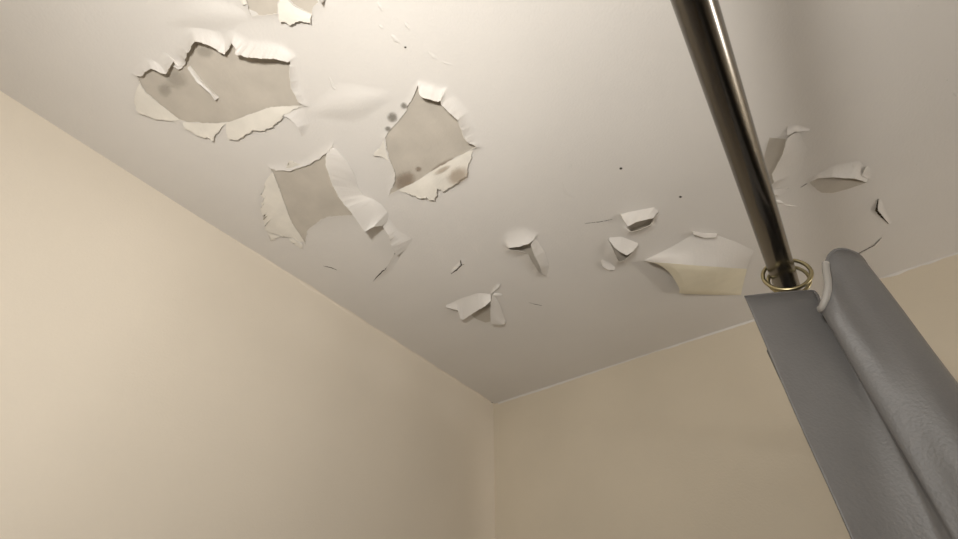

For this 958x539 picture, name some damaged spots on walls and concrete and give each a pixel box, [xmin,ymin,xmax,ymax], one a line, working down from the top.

peeling [127,0,329,141]
peeling [260,78,485,282]
peeling [764,125,873,201]
peeling [497,225,551,281]
peeling [601,207,754,295]
peeling [446,282,506,325]